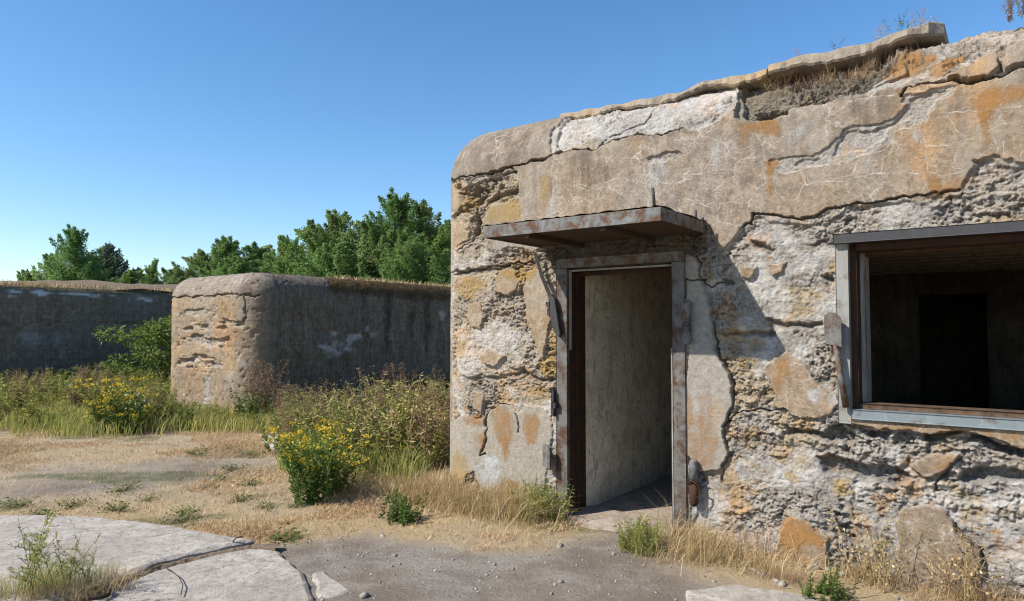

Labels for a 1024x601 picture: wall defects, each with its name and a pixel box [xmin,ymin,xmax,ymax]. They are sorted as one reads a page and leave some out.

crack [566,115,964,227]
spalling [550,26,1024,173]
spalling [450,153,1024,601]
crack [702,321,799,482]